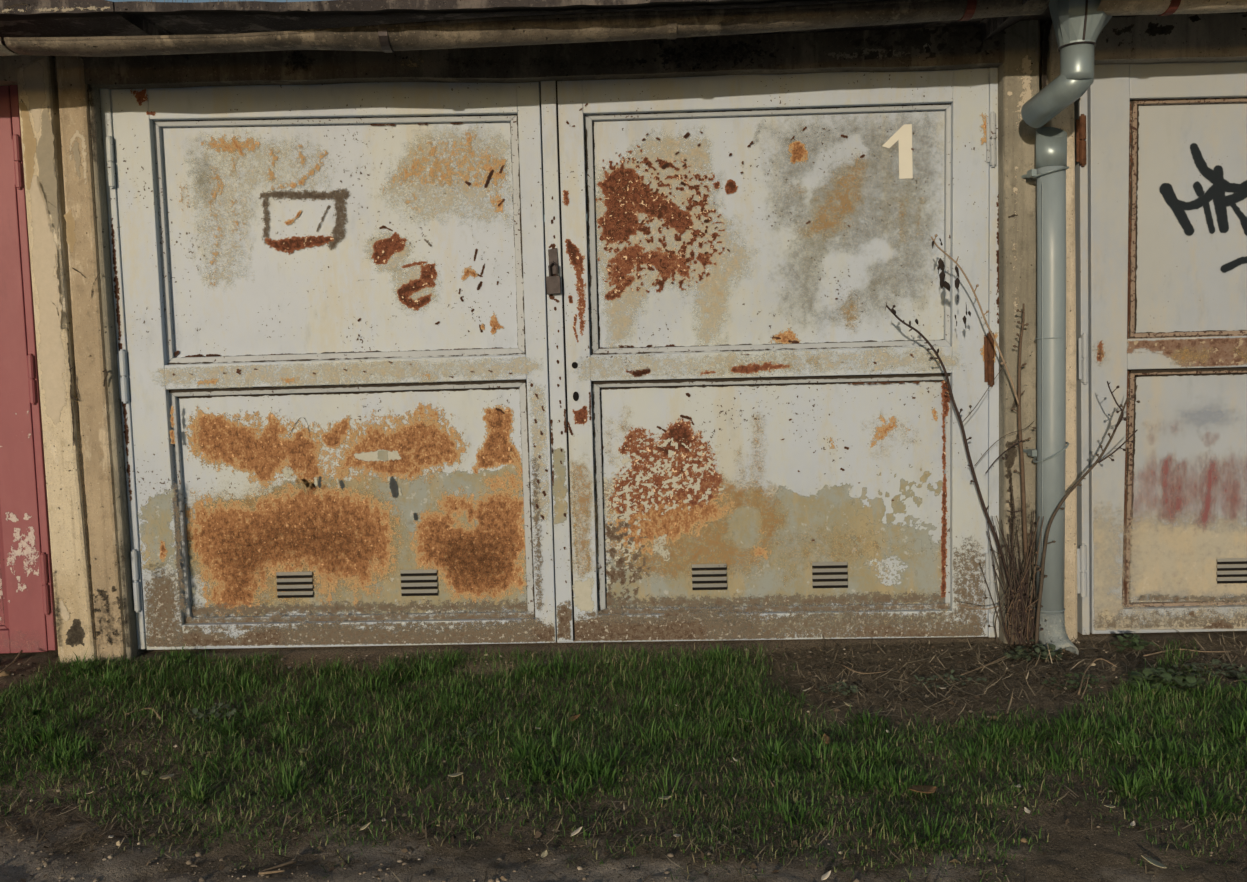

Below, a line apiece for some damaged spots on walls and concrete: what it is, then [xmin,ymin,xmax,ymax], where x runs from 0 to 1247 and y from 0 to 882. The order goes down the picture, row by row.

peeling [0,512,39,603]
rust [159,402,527,617]
rust [367,225,437,311]
rust [567,392,591,435]
rust [565,131,749,349]
rust [570,415,784,613]
rust [768,328,813,344]
rust [848,380,950,598]
rust [980,196,999,363]
rust [1123,371,1247,606]
rust [1127,99,1247,367]